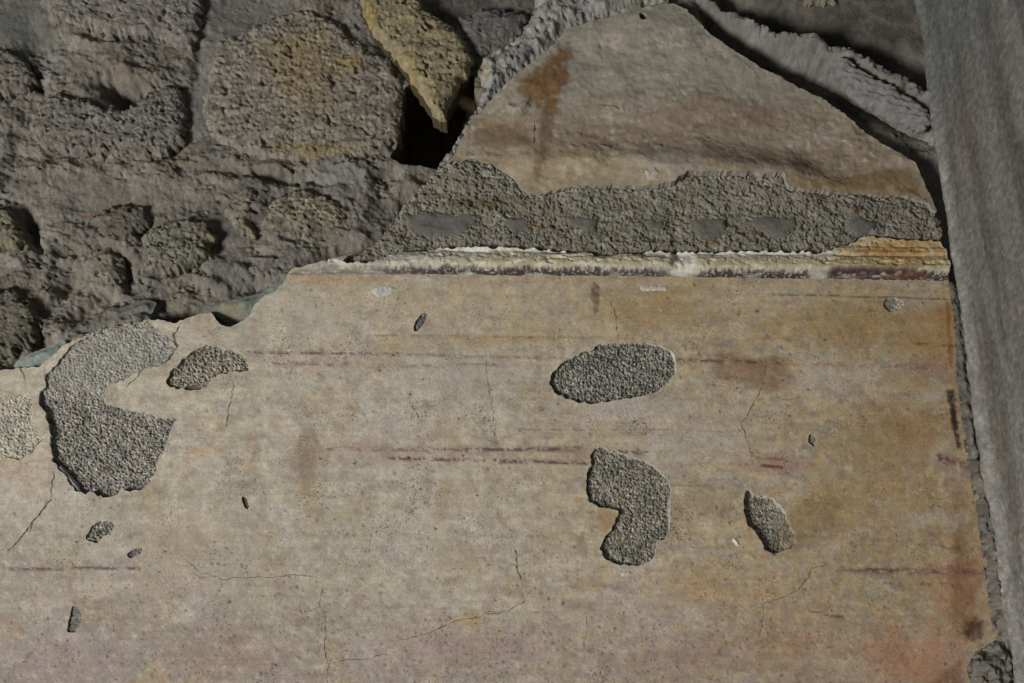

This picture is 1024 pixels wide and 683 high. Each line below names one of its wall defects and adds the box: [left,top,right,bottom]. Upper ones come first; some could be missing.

flaking render [668,0,710,33]
flaking render [713,0,927,91]
rust [518,50,571,163]
flaking render [0,0,535,498]
spalling [346,65,1015,683]
crack [8,472,54,550]
spalling [86,521,114,543]